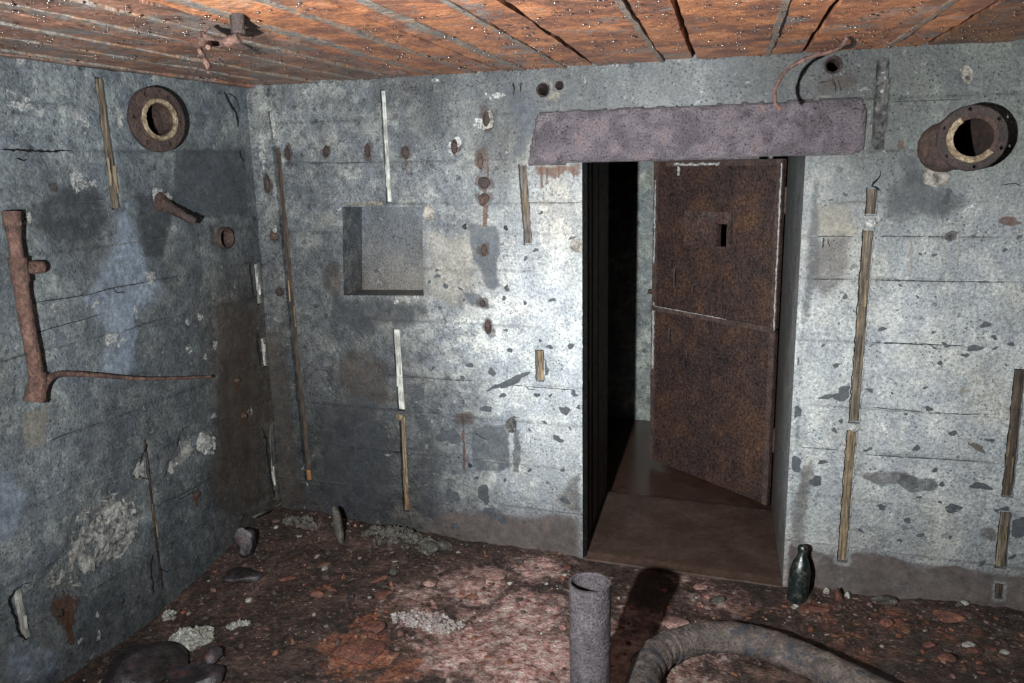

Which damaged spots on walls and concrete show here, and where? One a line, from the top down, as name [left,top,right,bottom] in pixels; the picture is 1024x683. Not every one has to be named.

crack [1,148,72,161]
efflorescence [70,169,103,193]
corrosion [475,149,494,226]
corrosion [537,165,579,188]
leakage [789,546,1024,611]